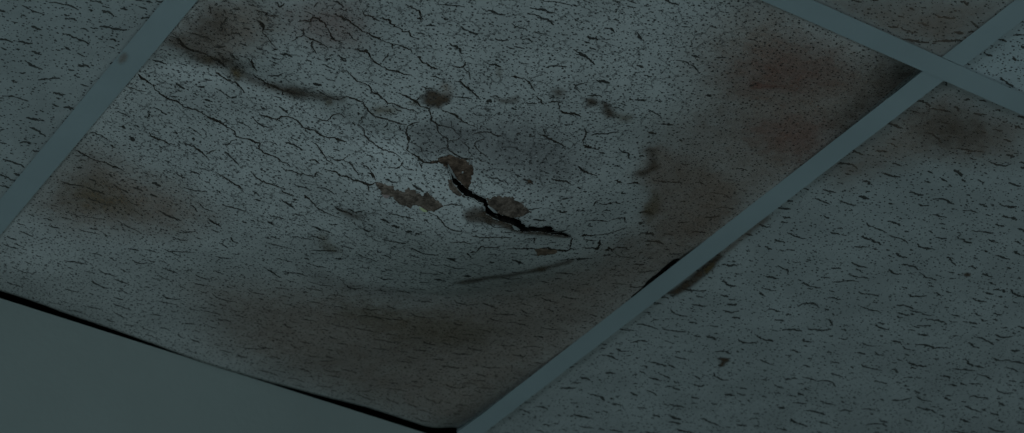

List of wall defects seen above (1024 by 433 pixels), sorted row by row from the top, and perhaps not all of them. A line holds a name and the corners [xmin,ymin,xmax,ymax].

crack [0,0,746,424]
spalling [375,182,443,212]
spalling [486,196,532,218]
crack [491,82,1024,433]